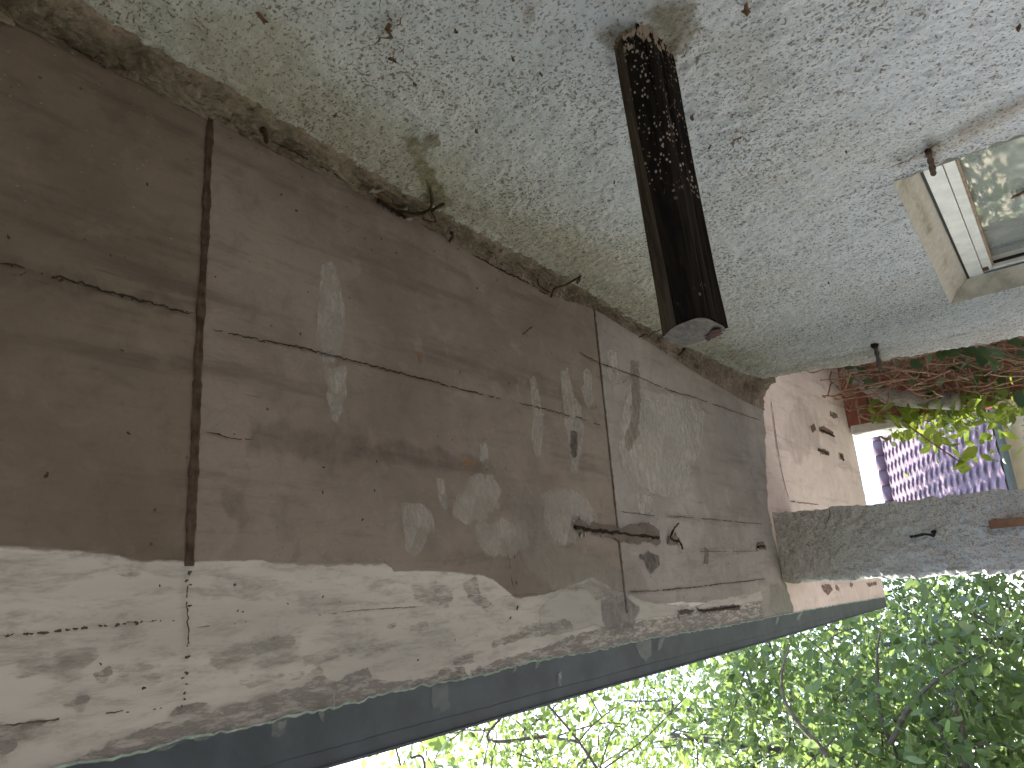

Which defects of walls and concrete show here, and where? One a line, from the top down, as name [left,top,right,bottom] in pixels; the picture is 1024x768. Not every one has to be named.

crack [0,263,193,314]
crack [213,329,600,425]
crack [582,353,831,528]
spalling [572,517,683,550]
crack [0,718,59,727]
crack [2,571,247,714]
crack [318,606,419,614]
peeling [86,603,764,758]